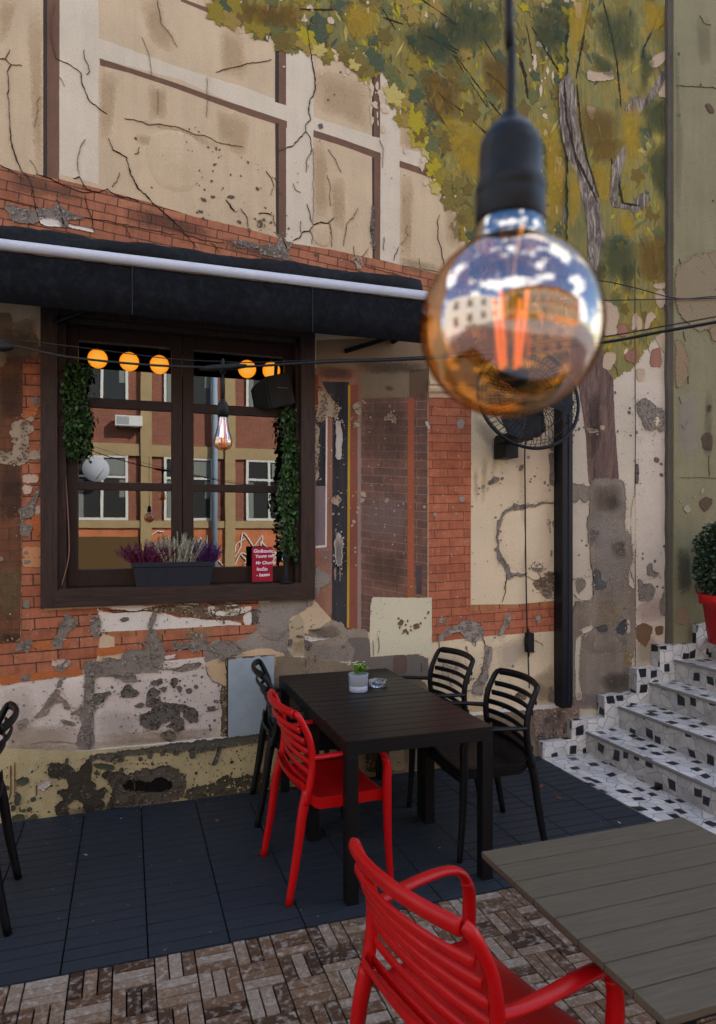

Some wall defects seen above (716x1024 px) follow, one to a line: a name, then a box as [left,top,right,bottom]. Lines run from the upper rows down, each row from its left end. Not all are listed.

crack [0,1,272,250]
crack [226,3,444,275]
spalling [4,202,95,233]
spalling [232,207,291,261]
peeling [603,251,716,388]
spalling [0,396,40,536]
peeling [315,388,362,482]
spalling [617,398,666,436]
spalling [12,603,271,822]
spalling [438,613,511,696]
spalling [521,464,666,744]